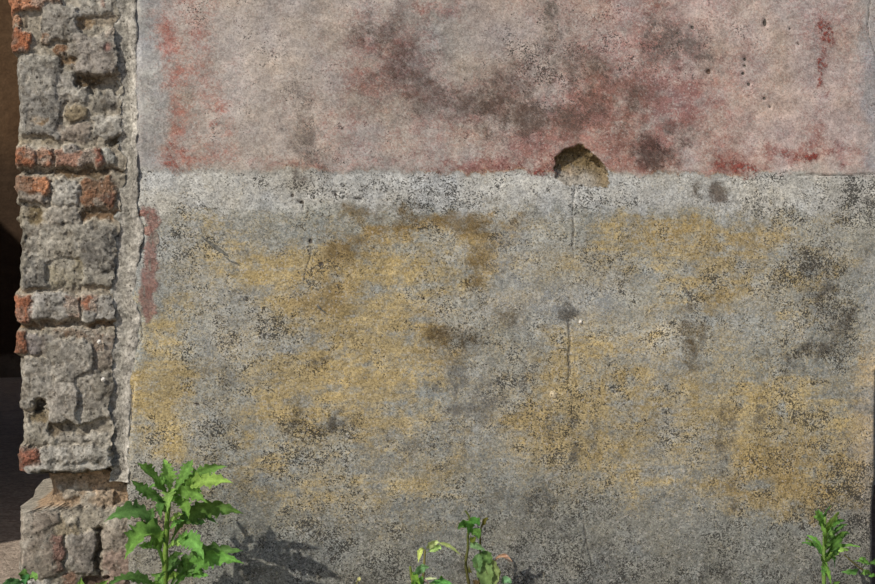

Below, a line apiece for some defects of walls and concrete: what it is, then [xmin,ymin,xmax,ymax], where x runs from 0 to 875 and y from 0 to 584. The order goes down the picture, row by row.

water stain [387,71,601,137]
spalling [553,144,610,188]
water stain [630,137,674,170]